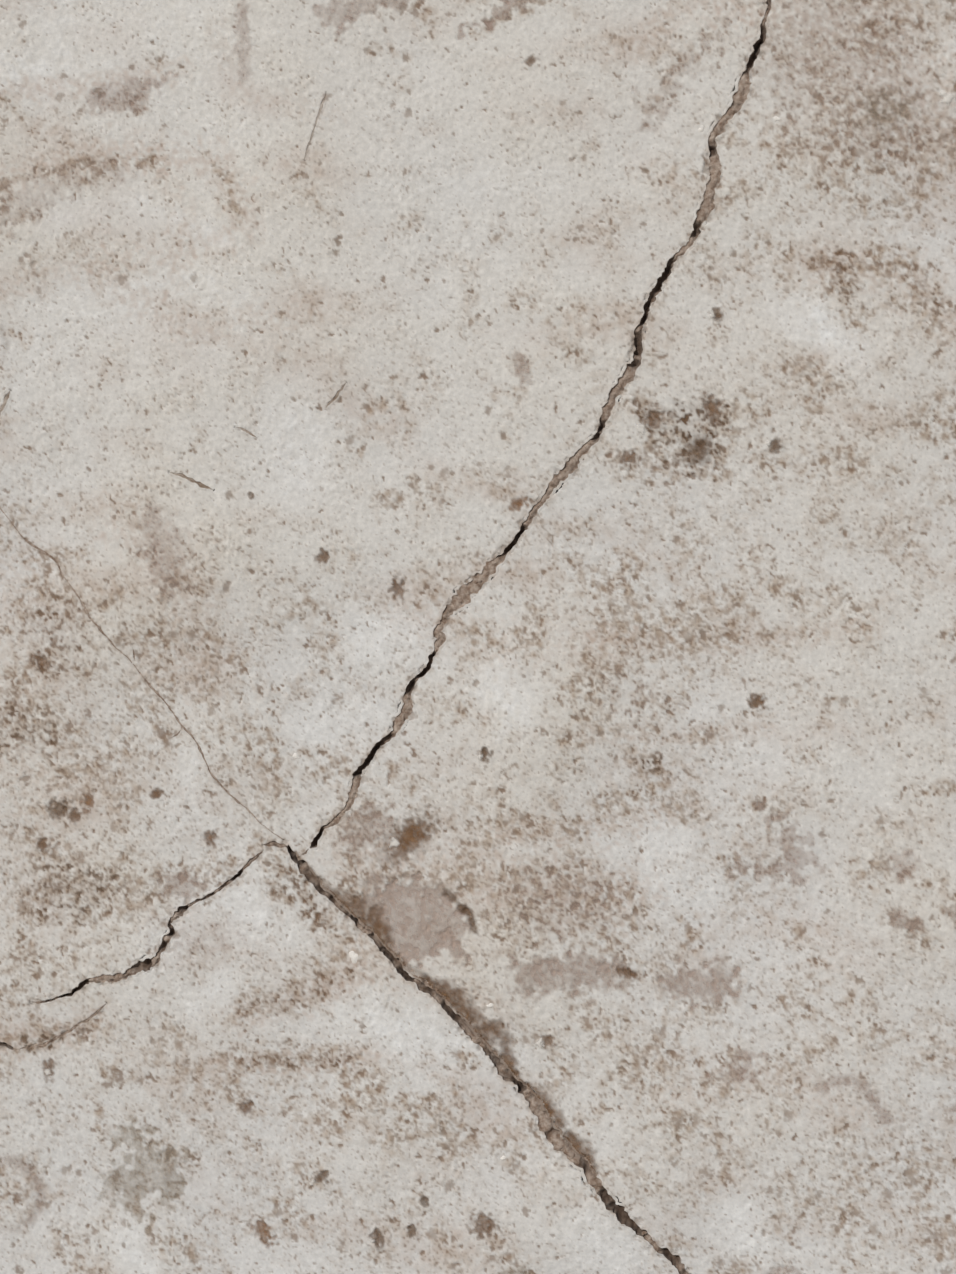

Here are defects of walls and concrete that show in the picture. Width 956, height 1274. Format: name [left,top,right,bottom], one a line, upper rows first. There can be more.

crack [296,0,774,861]
crack [0,500,695,1274]